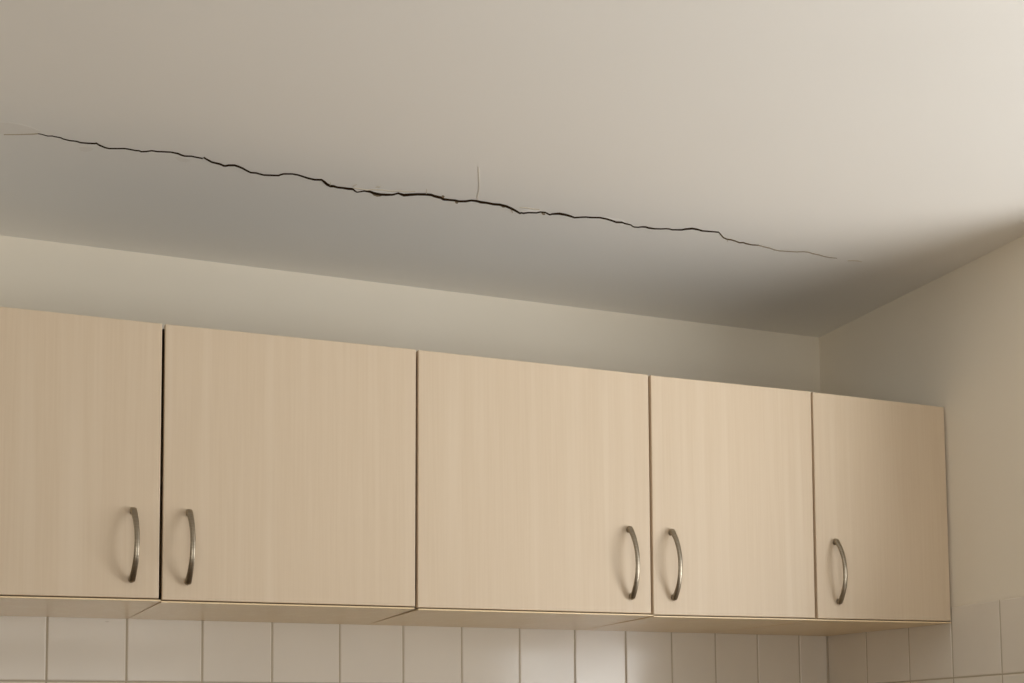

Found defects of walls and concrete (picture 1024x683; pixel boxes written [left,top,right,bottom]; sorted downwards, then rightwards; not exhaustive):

crack [4,133,862,262]